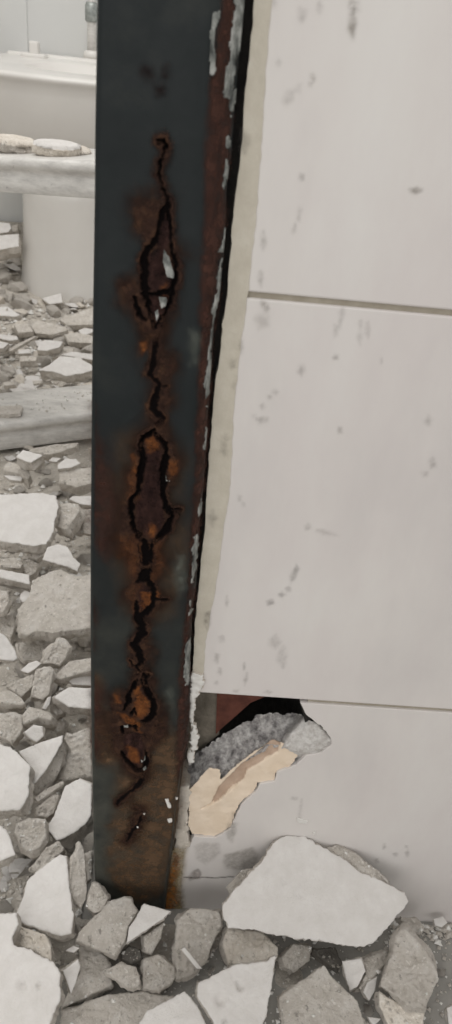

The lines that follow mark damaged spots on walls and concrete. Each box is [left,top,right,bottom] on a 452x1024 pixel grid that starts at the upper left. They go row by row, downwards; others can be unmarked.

peeling [209,0,244,118]
peeling [222,135,231,189]
crack [132,314,179,449]
peeling [203,228,226,407]
rust [90,0,236,909]
crack [115,535,173,687]
peeling [191,534,199,583]
spalling [183,637,331,836]
crack [113,769,148,846]